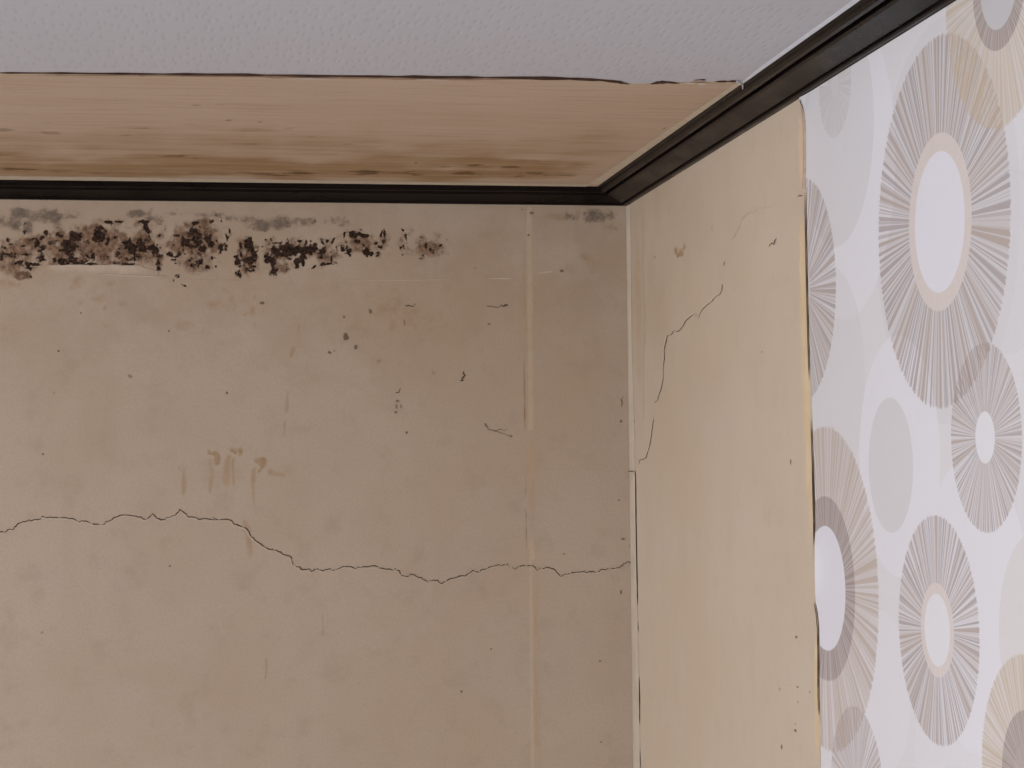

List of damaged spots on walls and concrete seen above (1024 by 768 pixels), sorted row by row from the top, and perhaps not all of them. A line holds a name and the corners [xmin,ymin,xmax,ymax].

water stain [0,208,464,376]
crack [628,262,724,472]
crack [0,509,631,586]